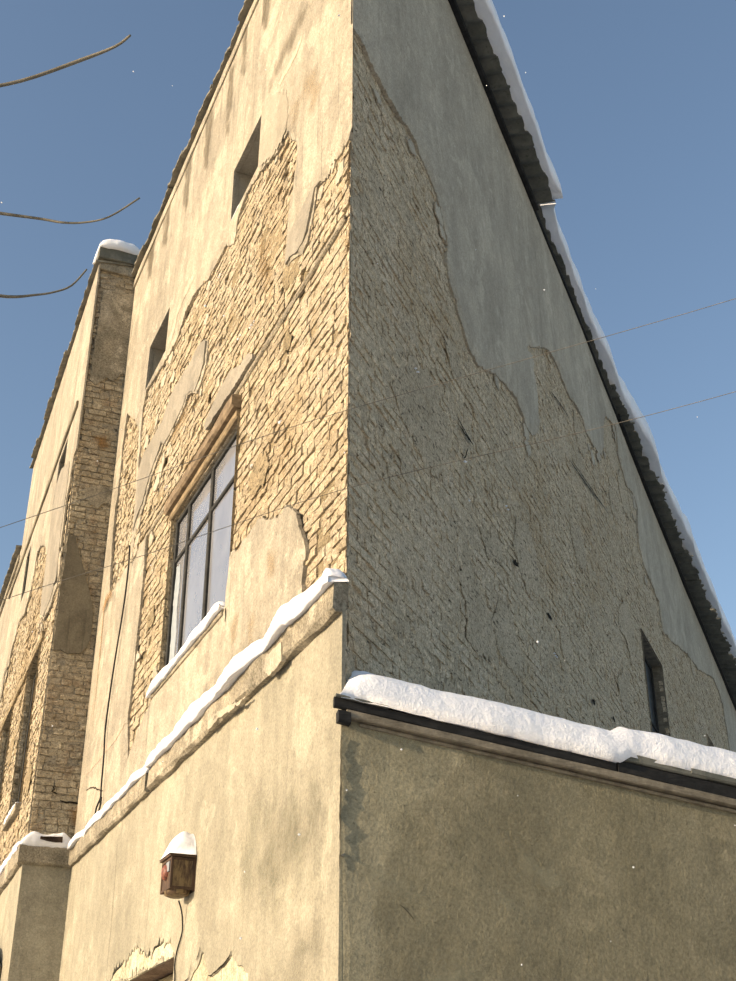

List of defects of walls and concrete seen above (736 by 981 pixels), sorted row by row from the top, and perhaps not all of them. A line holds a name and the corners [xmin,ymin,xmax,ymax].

spalling [0,271,135,866]
spalling [87,35,728,775]
flaking render [111,942,173,981]
flaking render [191,954,248,981]